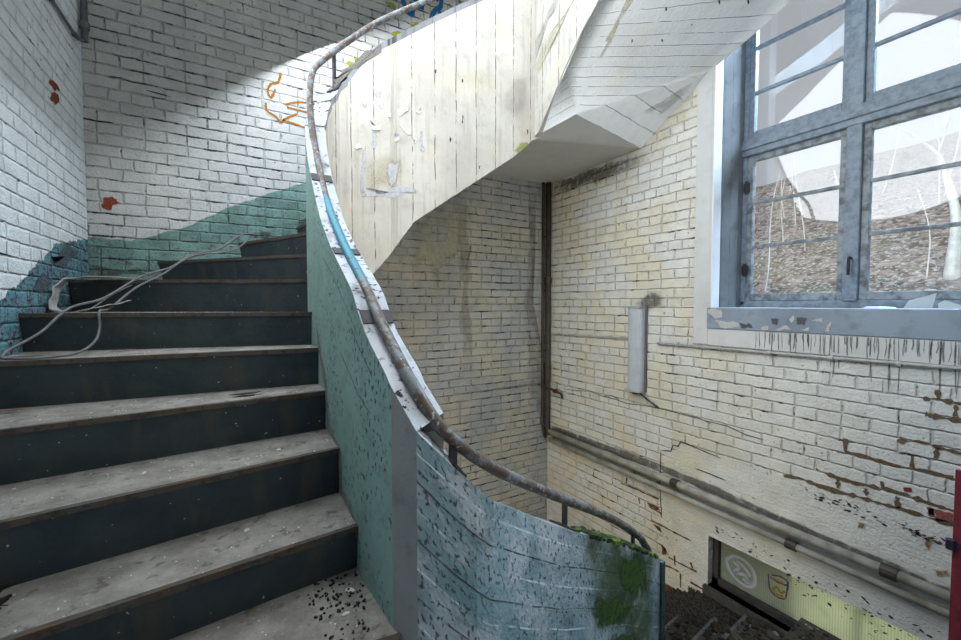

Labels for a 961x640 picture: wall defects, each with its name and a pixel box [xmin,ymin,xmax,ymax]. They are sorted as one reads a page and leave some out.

peeling [353,90,425,198]
peeling [52,244,78,266]
peeling [708,308,831,331]
water stain [755,333,961,398]
spalling [923,390,961,423]
spalling [842,438,953,480]
spalling [897,437,961,459]
spalling [783,468,954,545]